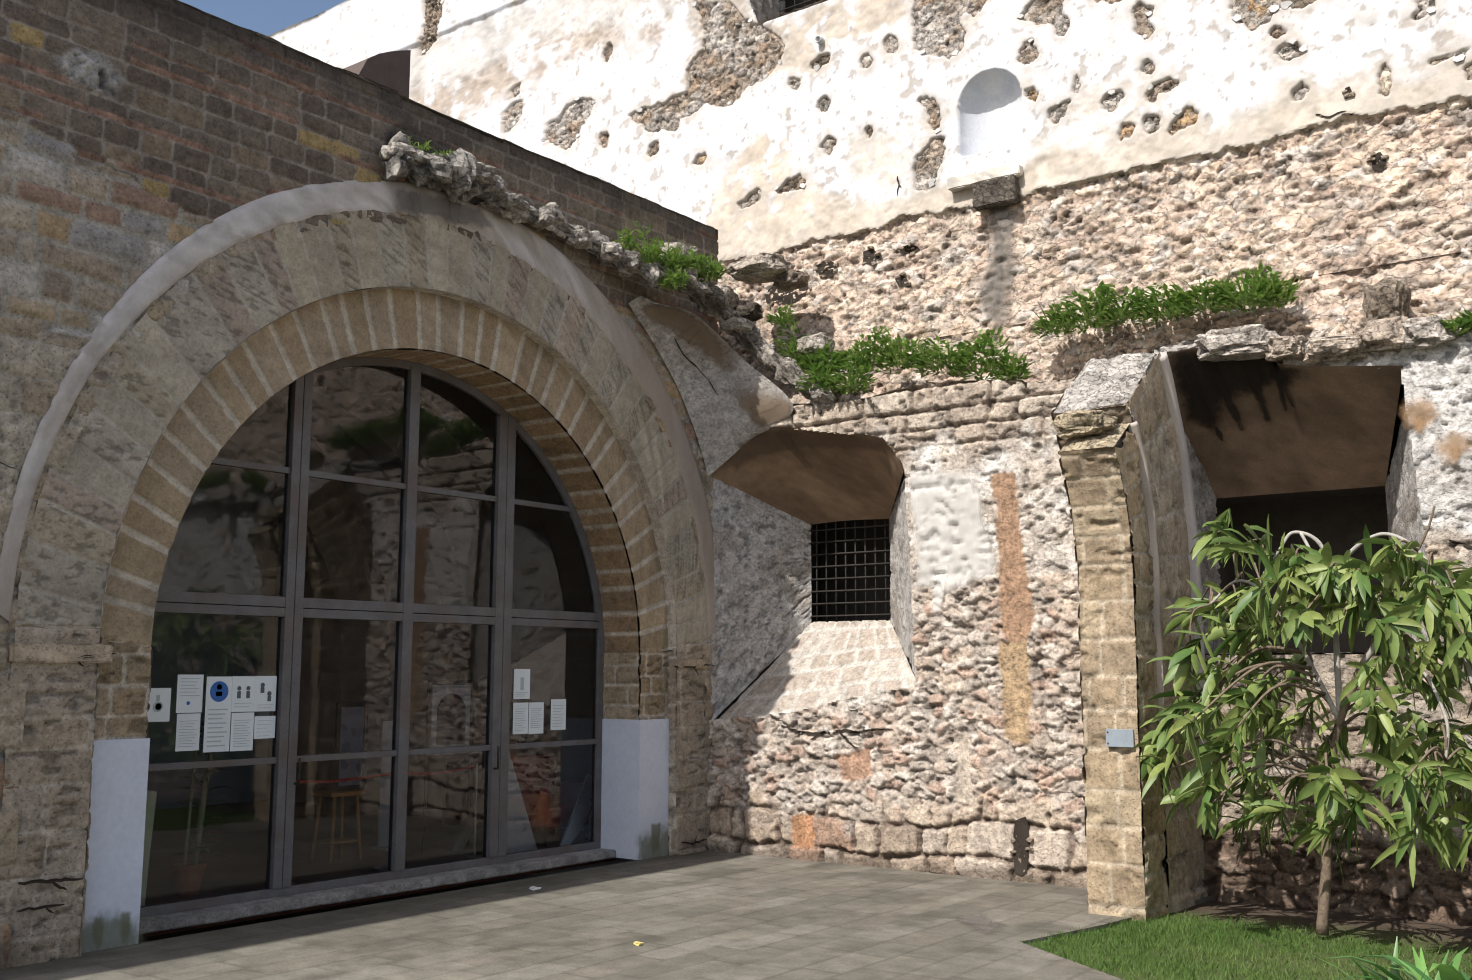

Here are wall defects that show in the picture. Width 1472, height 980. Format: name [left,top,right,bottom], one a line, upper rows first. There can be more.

flaking render [421,0,445,56]
flaking render [632,0,785,157]
flaking render [812,55,831,71]
flaking render [862,0,987,68]
flaking render [1017,0,1070,64]
flaking render [1095,0,1155,39]
flaking render [1232,0,1317,61]
flaking render [545,97,595,150]
leakage [1171,351,1299,441]
crack [781,725,893,748]